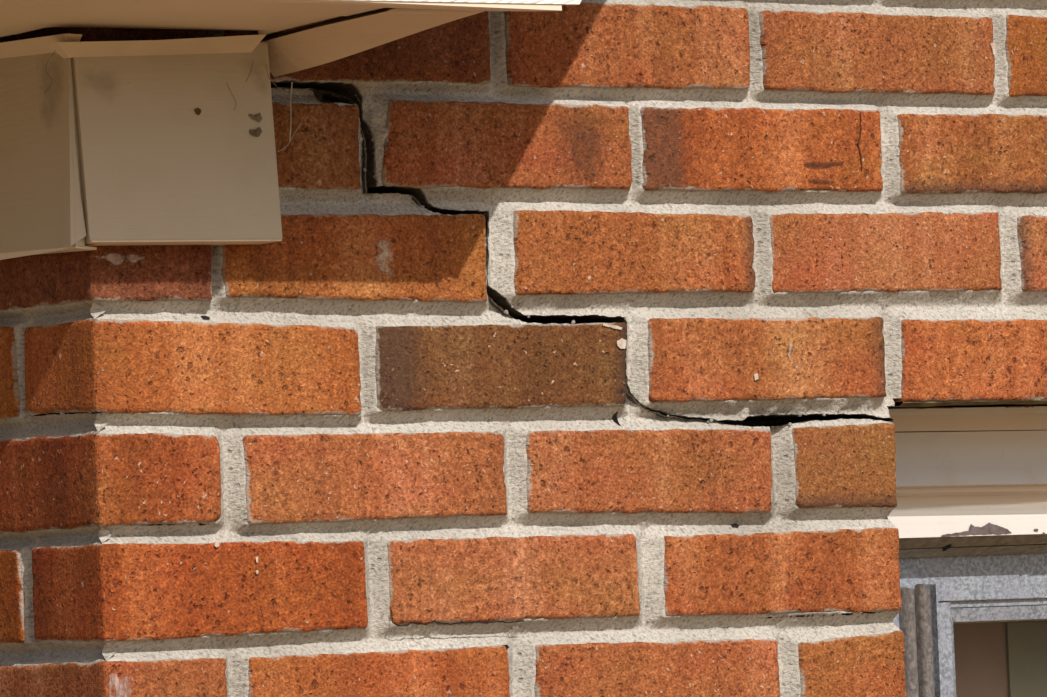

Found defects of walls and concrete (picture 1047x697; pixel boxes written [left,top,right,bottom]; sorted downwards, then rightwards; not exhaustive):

crack [271,80,893,429]
peeling [941,523,1012,537]